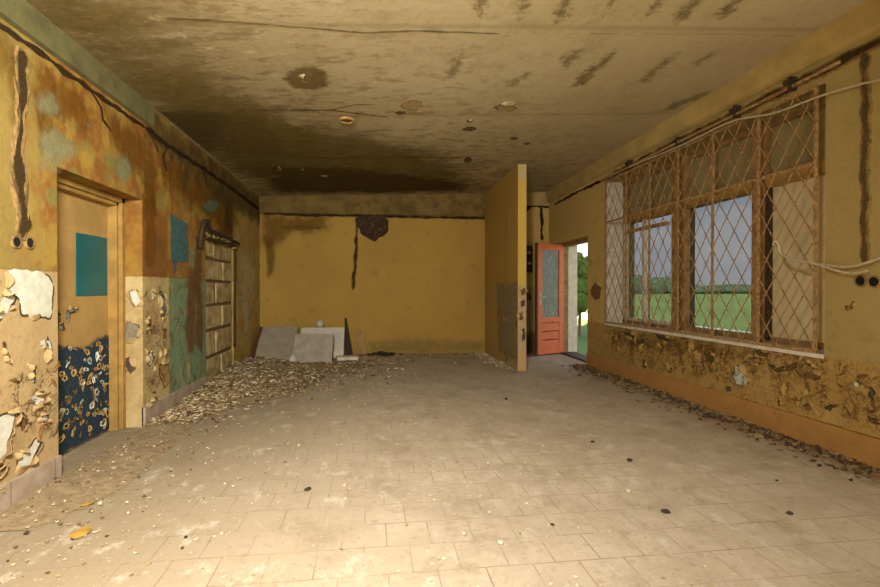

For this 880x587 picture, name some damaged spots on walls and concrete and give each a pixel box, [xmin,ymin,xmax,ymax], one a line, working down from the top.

crack [165,18,499,34]
leakage [576,52,615,85]
crack [0,22,383,217]
leakage [34,0,464,334]
spalling [357,214,389,241]
crack [384,213,485,221]
peeling [0,269,79,331]
peeling [0,336,109,494]
peeling [124,286,170,409]
peeling [611,330,880,429]